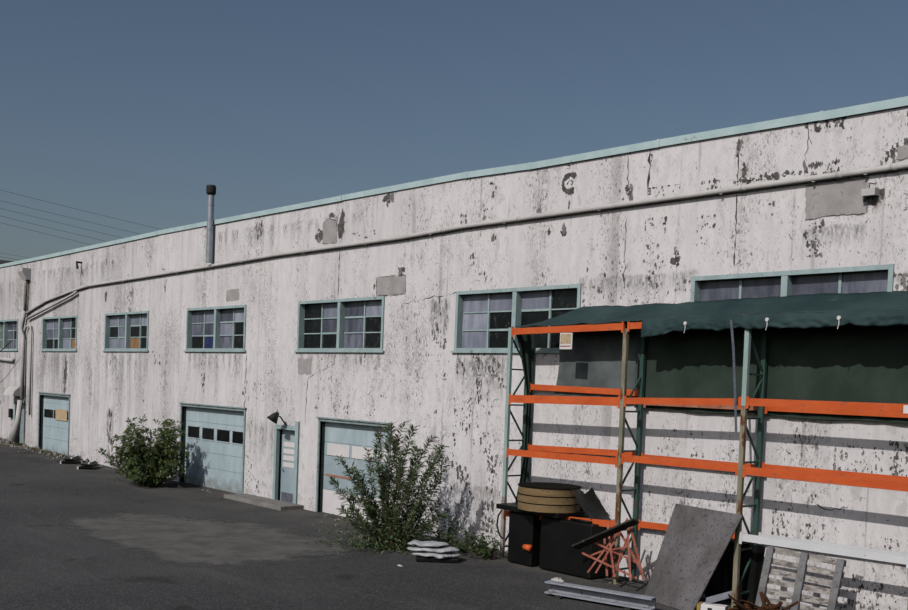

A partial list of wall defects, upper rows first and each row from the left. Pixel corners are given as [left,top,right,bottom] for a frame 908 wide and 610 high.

peeling [733,139,885,257]
peeling [315,208,376,244]
crack [376,274,456,306]
peeling [431,296,448,349]
peeling [438,353,506,533]
peeling [833,440,908,476]